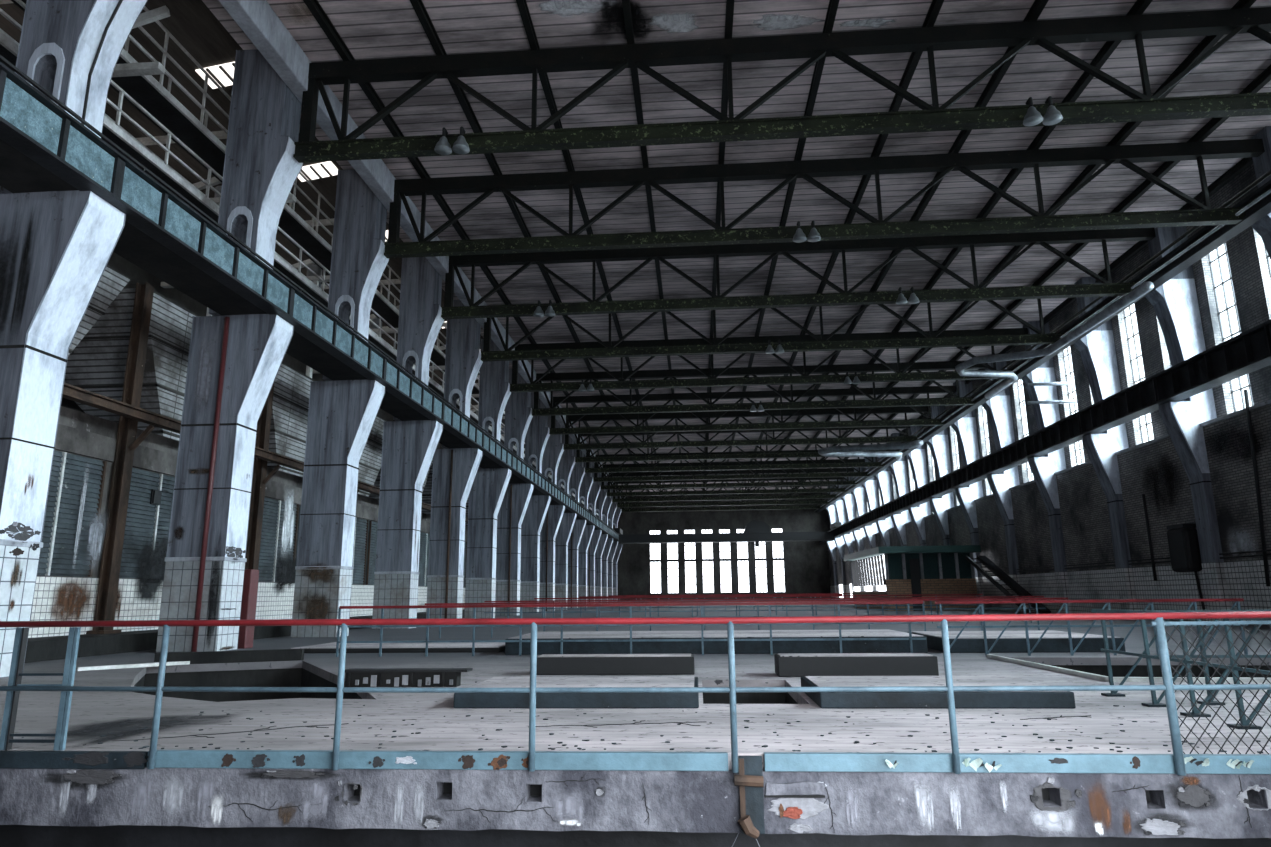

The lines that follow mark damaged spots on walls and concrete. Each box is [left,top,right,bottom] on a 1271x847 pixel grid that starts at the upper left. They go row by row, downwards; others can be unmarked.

damp [540,0,697,32]
damp [0,222,33,330]
spalling [0,522,41,556]
rust [52,582,90,621]
spalling [1138,784,1215,835]
spalling [1237,785,1271,811]